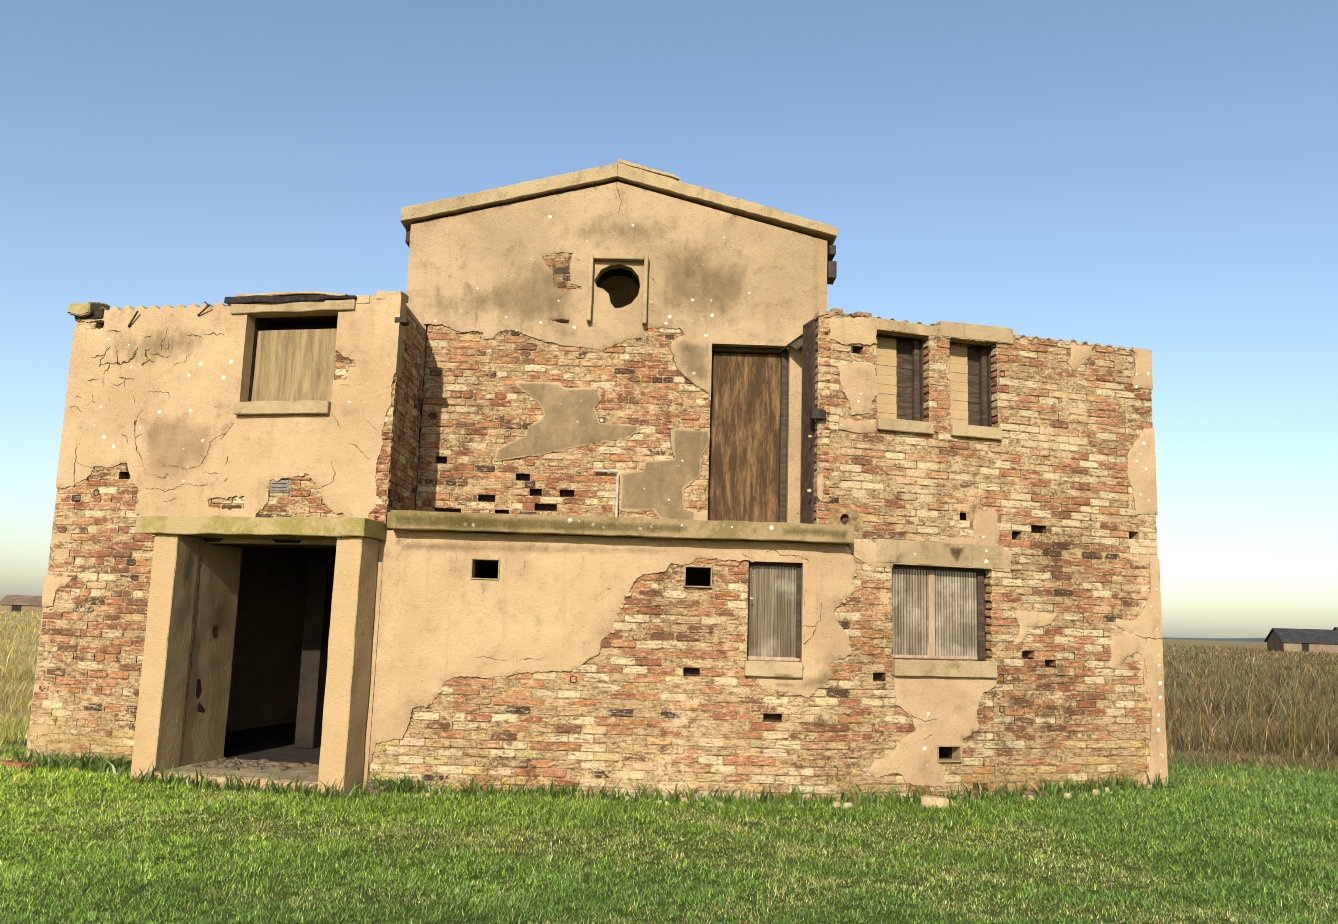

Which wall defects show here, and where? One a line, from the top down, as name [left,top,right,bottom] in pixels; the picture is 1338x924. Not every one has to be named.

flaking render [543,253,578,292]
flaking render [27,463,155,767]
crack [69,328,228,502]
flaking render [208,473,347,518]
flaking render [368,302,1157,803]